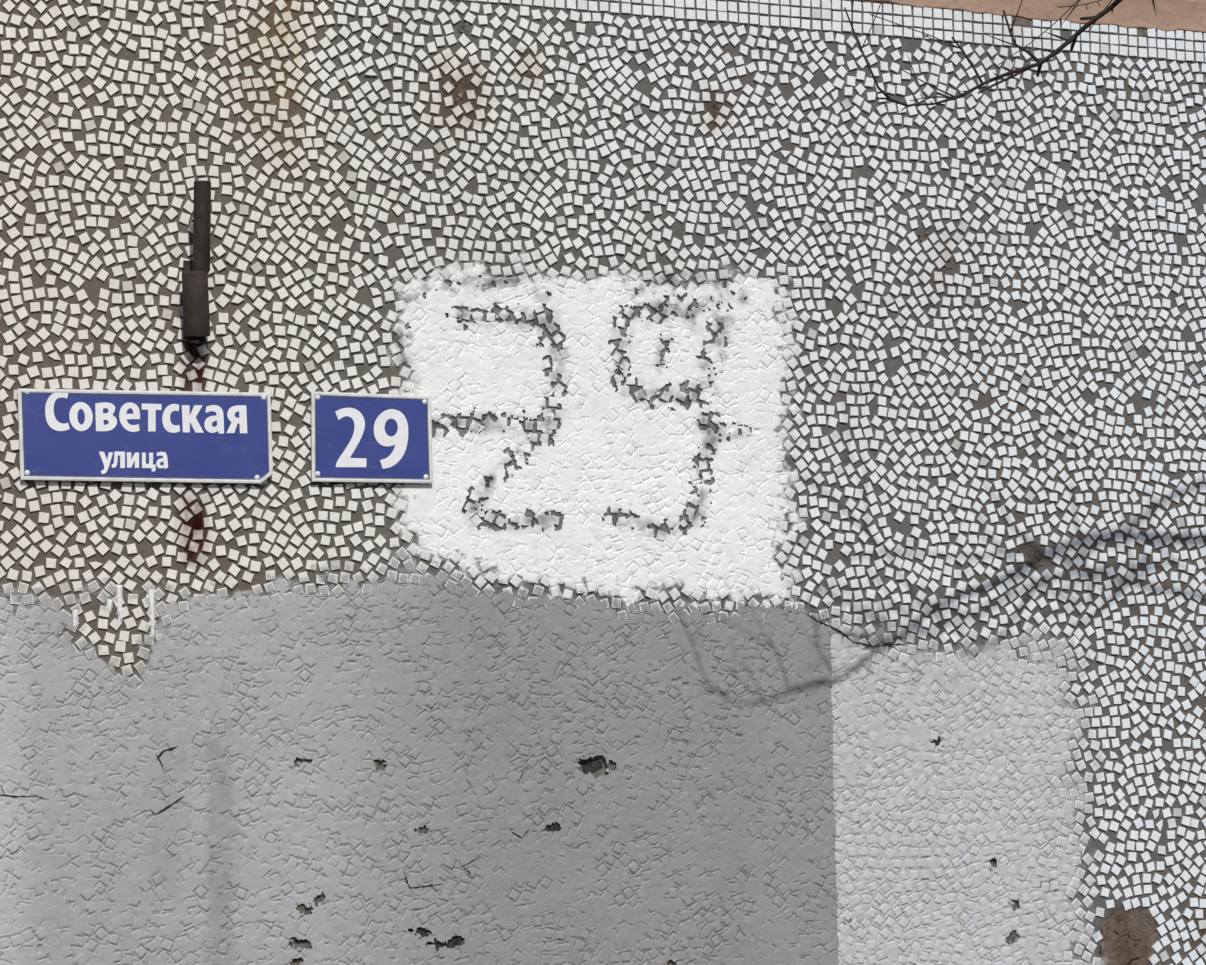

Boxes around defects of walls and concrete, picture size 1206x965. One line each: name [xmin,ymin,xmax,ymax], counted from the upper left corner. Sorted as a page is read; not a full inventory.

rust [188,342,203,382]
rust [183,501,203,564]
spalling [1099,907,1158,965]